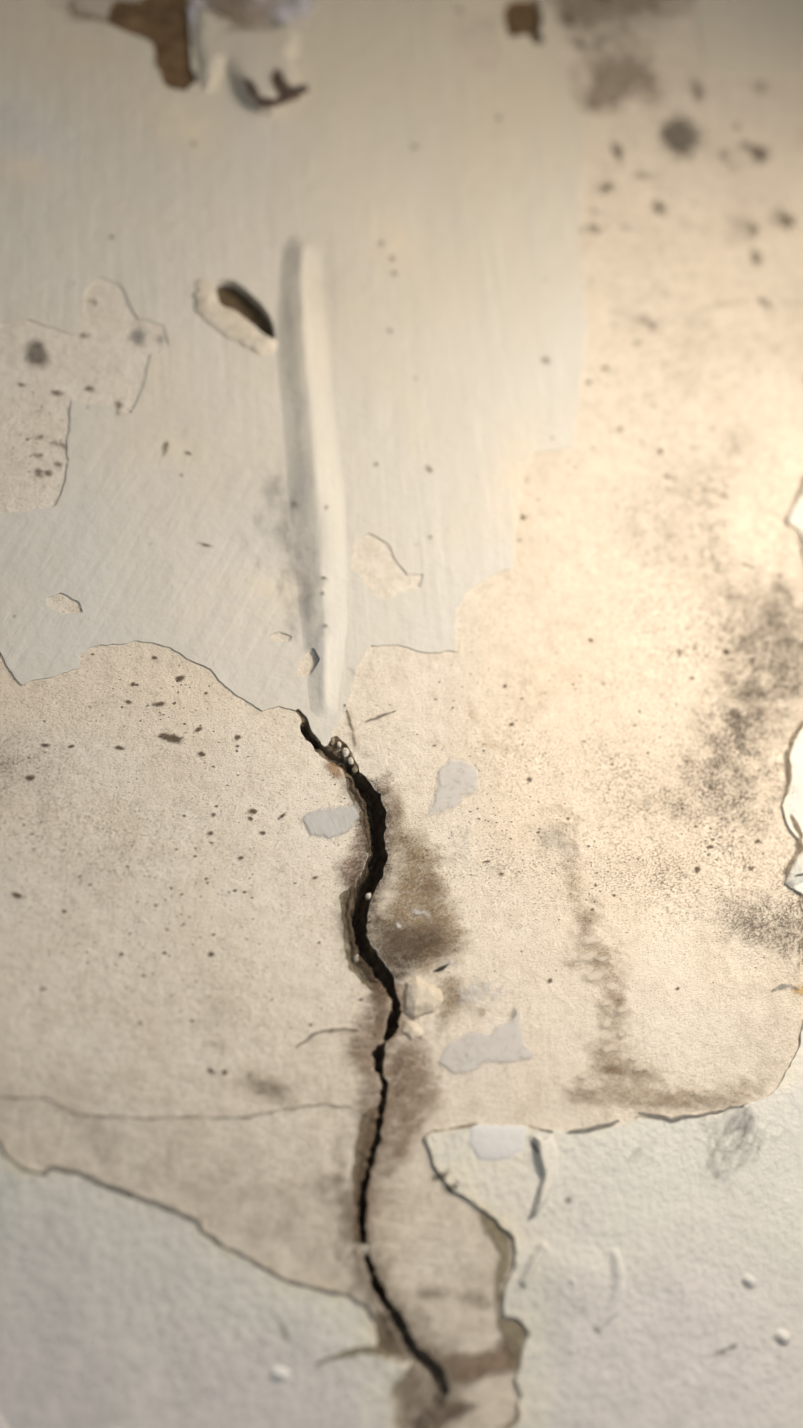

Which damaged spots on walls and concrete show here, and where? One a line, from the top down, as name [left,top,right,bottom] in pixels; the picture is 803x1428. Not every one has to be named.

peeling [69,0,304,116]
leakage [553,0,669,108]
peeling [0,278,169,514]
peeling [193,279,277,356]
peeling [333,0,803,1428]
leakage [665,571,803,836]
peeling [0,641,391,1326]
crack [0,704,459,1428]
leakage [376,775,467,1018]
leakage [720,898,803,958]
leakage [431,1401,473,1428]
leakage [427,1212,526,1384]